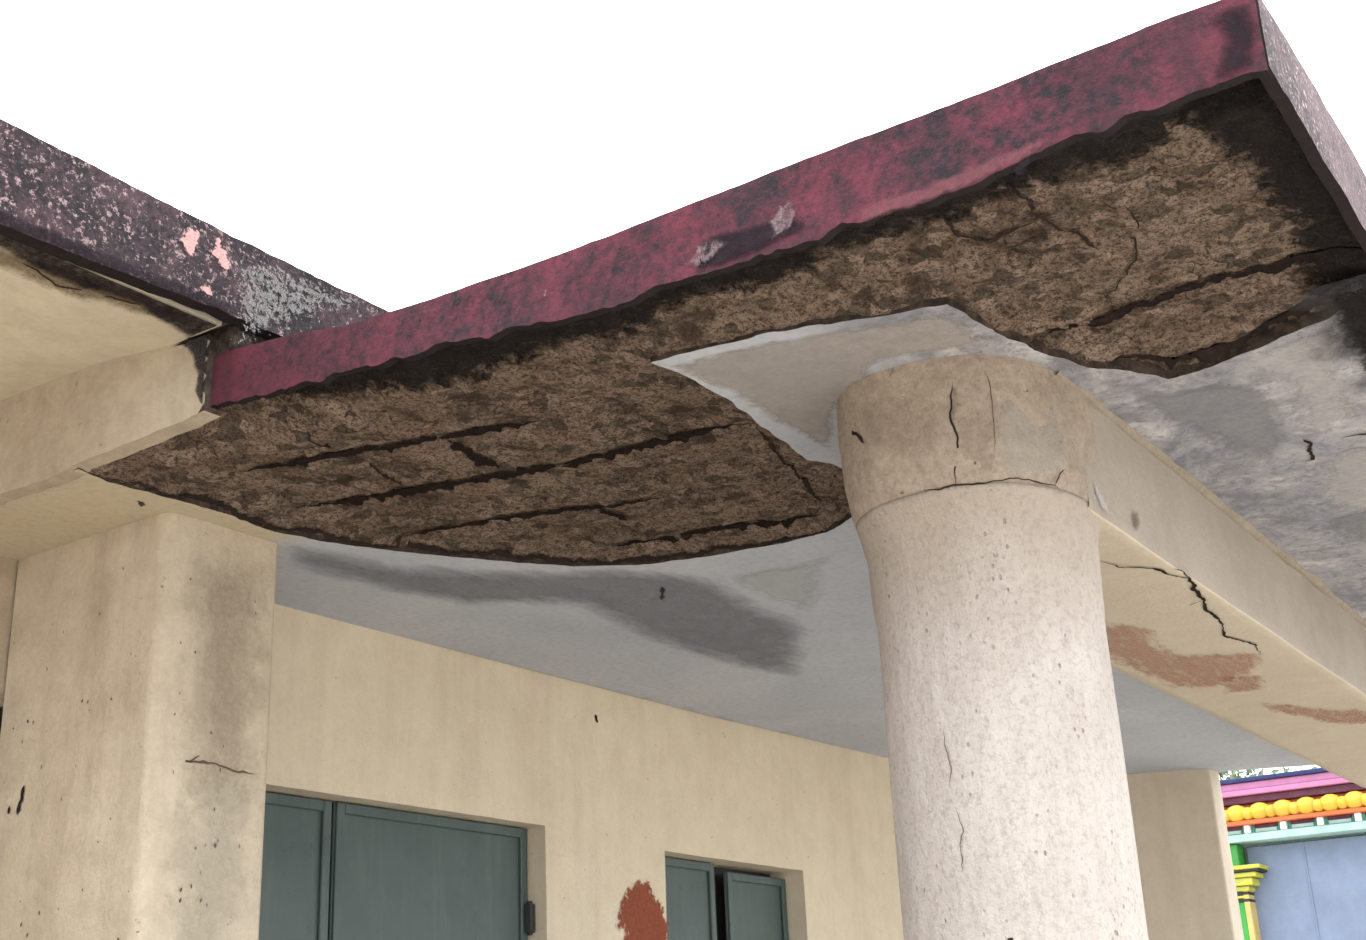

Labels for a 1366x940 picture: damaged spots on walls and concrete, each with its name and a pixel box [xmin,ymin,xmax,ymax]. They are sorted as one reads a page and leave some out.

leakage [282,8,1366,399]
spalling [90,114,1366,566]
leakage [681,319,979,442]
crack [920,374,1065,492]
leakage [308,558,789,668]
crack [1101,561,1261,654]
peeling [615,880,669,940]